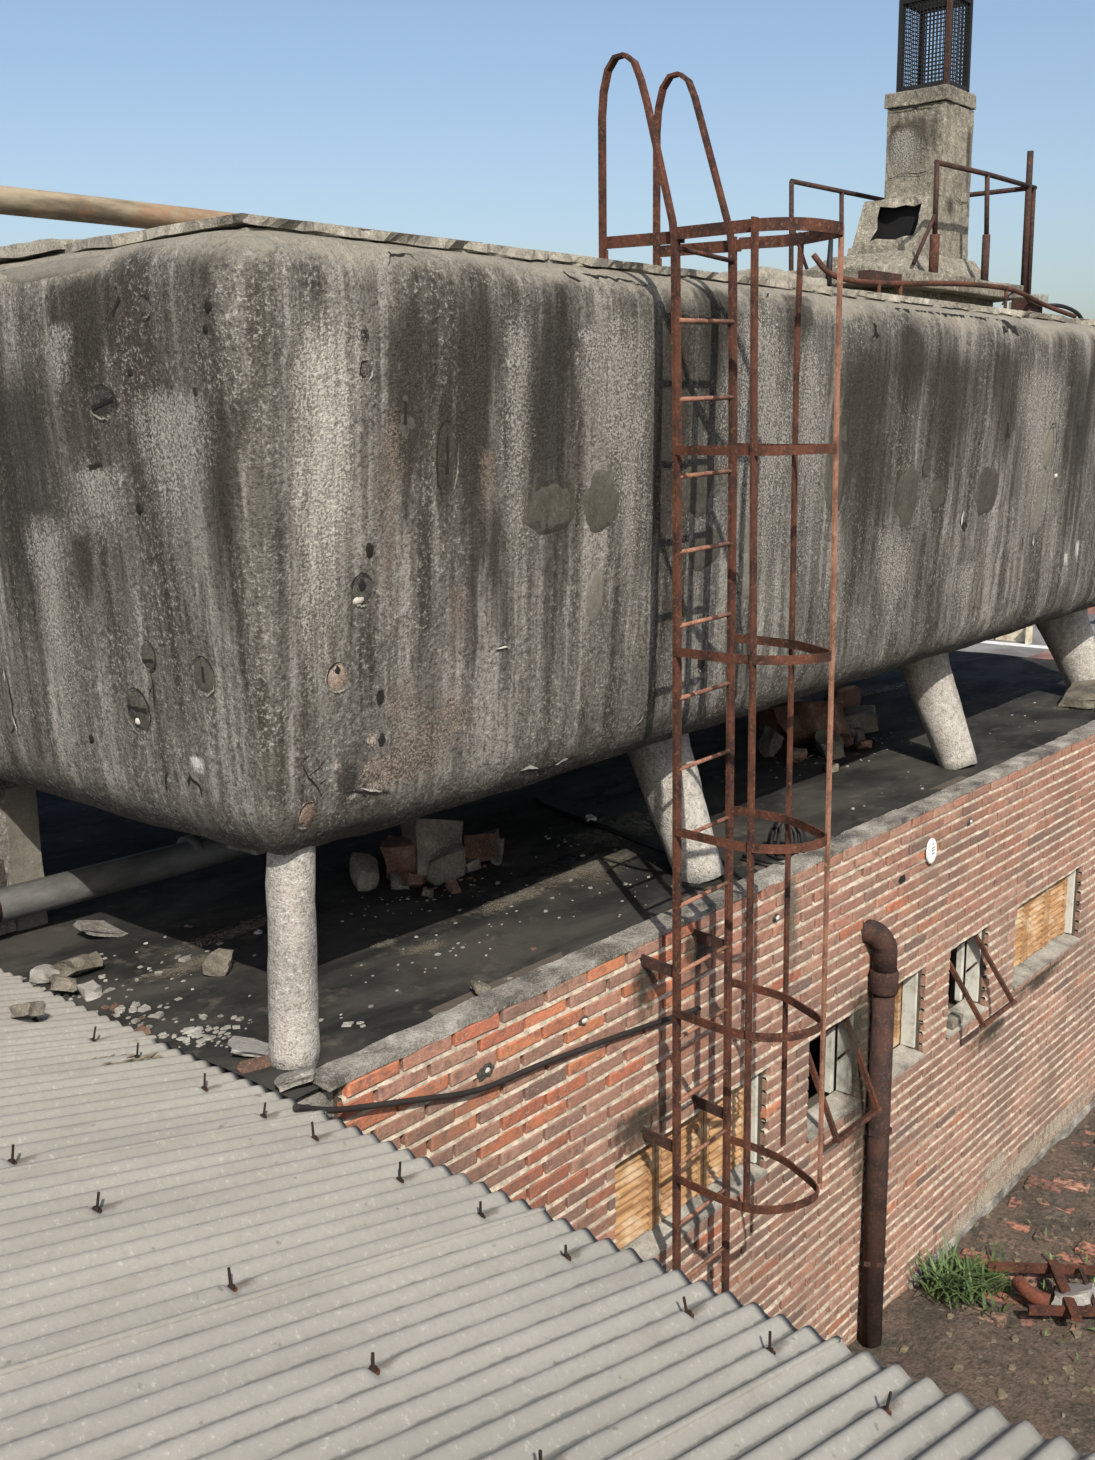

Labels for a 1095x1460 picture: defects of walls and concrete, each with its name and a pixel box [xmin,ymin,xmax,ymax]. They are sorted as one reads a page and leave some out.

water stain [0,276,126,707]
water stain [134,389,245,547]
water stain [290,304,361,705]
water stain [388,289,1094,645]
spalling [139,640,157,671]
spalling [191,655,216,697]
spalling [325,662,348,693]
spalling [125,687,151,735]
water stain [191,757,204,773]